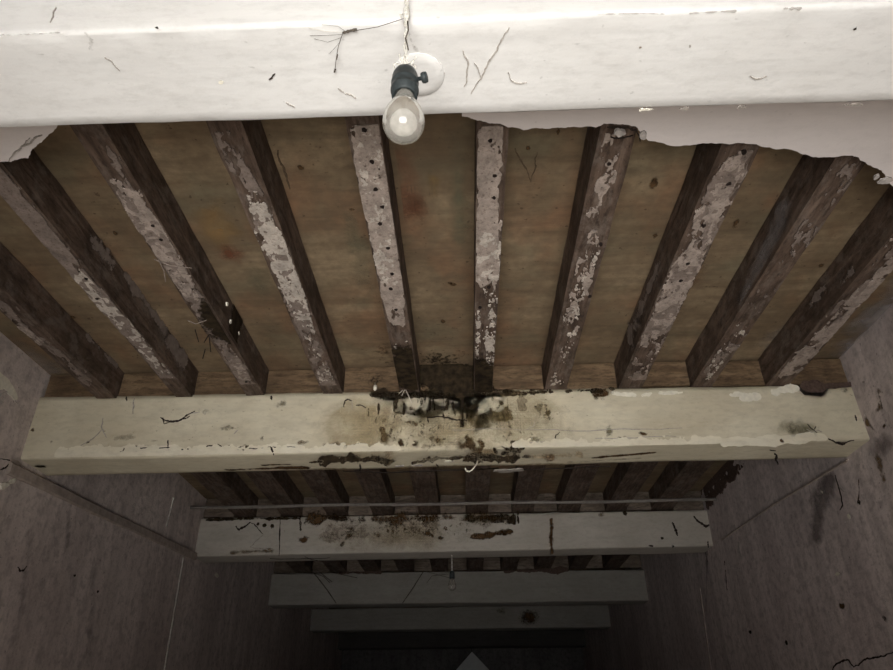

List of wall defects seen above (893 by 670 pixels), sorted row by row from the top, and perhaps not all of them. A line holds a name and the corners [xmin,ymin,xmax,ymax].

crack [463,28,509,94]
peeling [0,125,188,386]
peeling [106,145,255,385]
peeling [215,130,337,386]
peeling [350,124,405,327]
spalling [462,100,893,402]
peeling [54,441,401,457]
damp [360,345,565,470]
peeling [512,432,828,448]
damp [206,510,520,540]
crack [832,652,893,670]